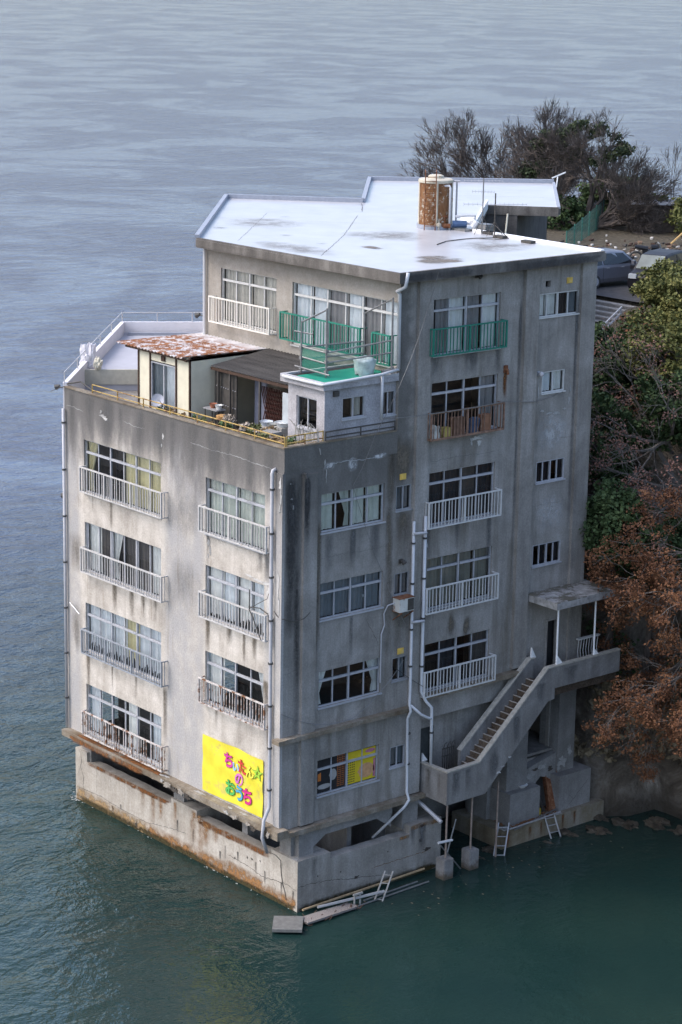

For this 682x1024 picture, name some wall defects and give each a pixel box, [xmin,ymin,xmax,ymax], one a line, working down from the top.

rust [70,735,176,813]
rust [77,789,296,910]
crack [229,847,425,891]